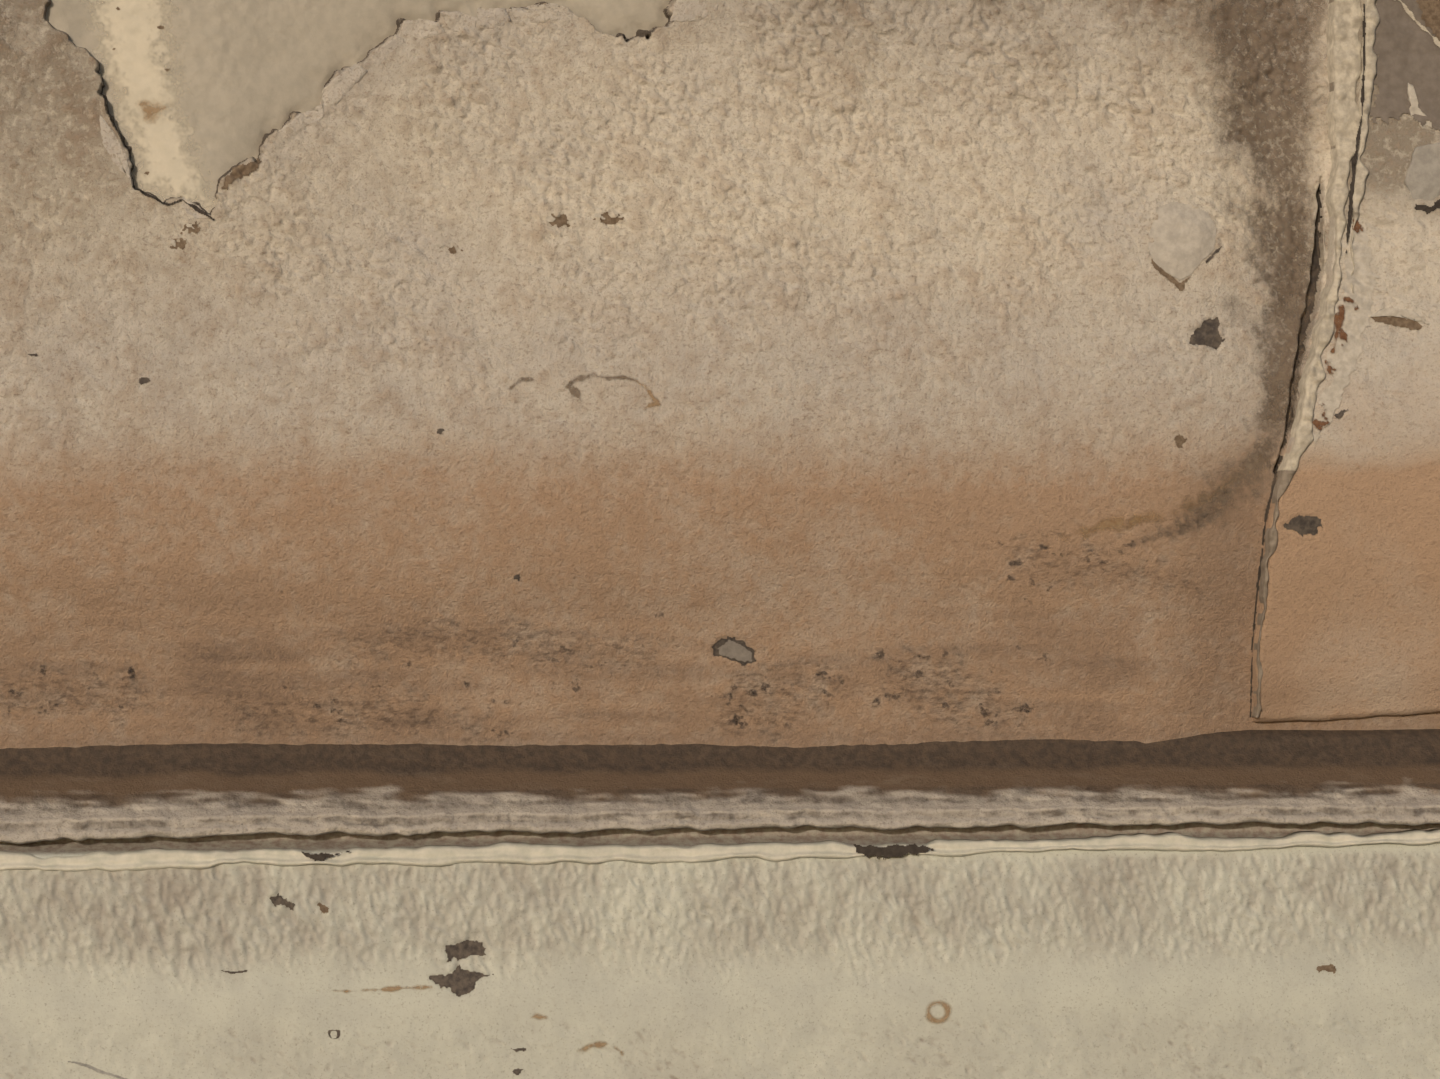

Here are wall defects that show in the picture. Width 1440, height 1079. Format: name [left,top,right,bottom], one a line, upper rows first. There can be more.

crack [1399,0,1440,48]
peeling [46,0,718,250]
peeling [1370,0,1440,214]
water stain [1179,0,1325,529]
peeling [1189,317,1225,349]
crack [1250,4,1366,717]
crack [1368,308,1430,330]
peeling [1284,515,1323,537]
peeling [712,636,756,666]
peeling [429,940,494,997]